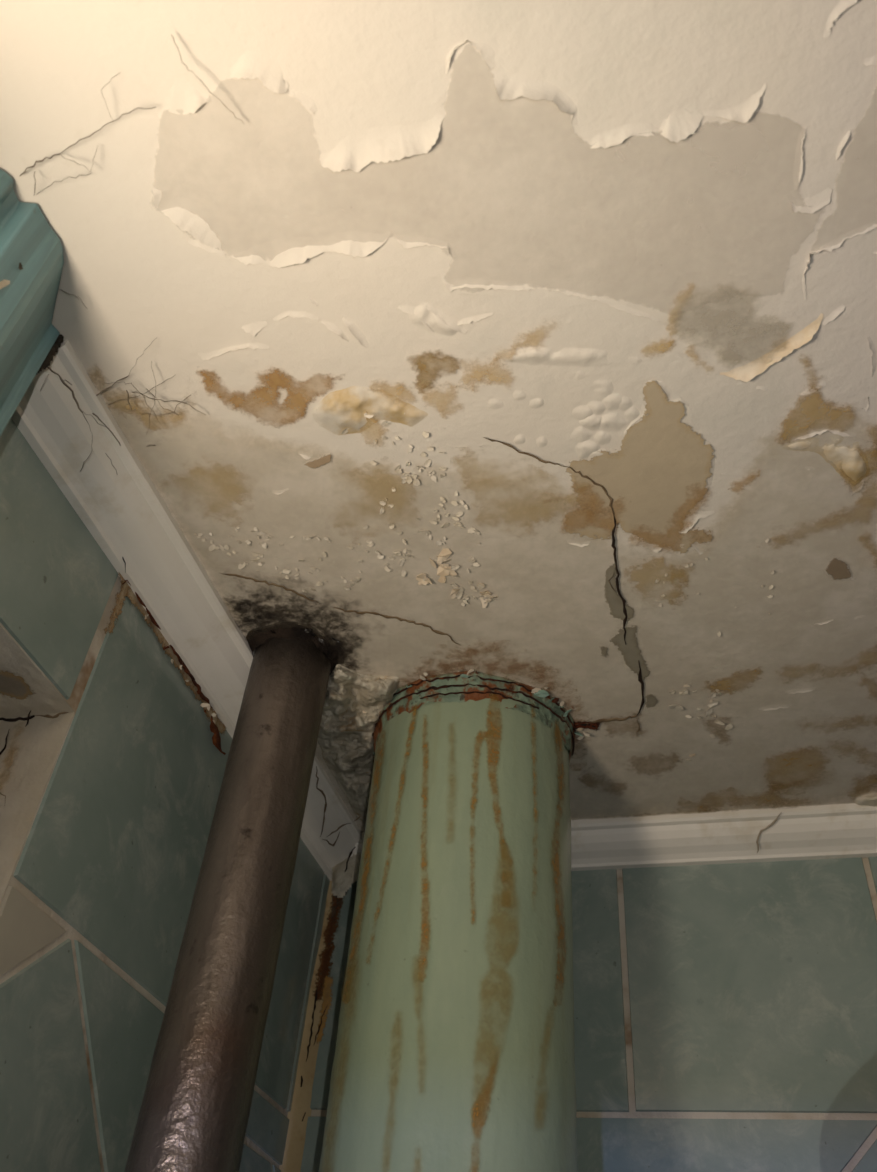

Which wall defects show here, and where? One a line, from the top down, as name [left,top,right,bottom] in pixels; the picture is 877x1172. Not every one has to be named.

peeling [318,113,445,172]
damp [200,369,333,423]
damp [397,353,456,395]
peeling [562,380,715,568]
damp [780,385,852,440]
crack [220,573,460,645]
crack [372,437,645,756]
crack [0,711,68,755]
flaking render [317,664,428,824]
rust [306,735,396,1061]
rust [470,694,515,1008]
rust [552,706,600,987]